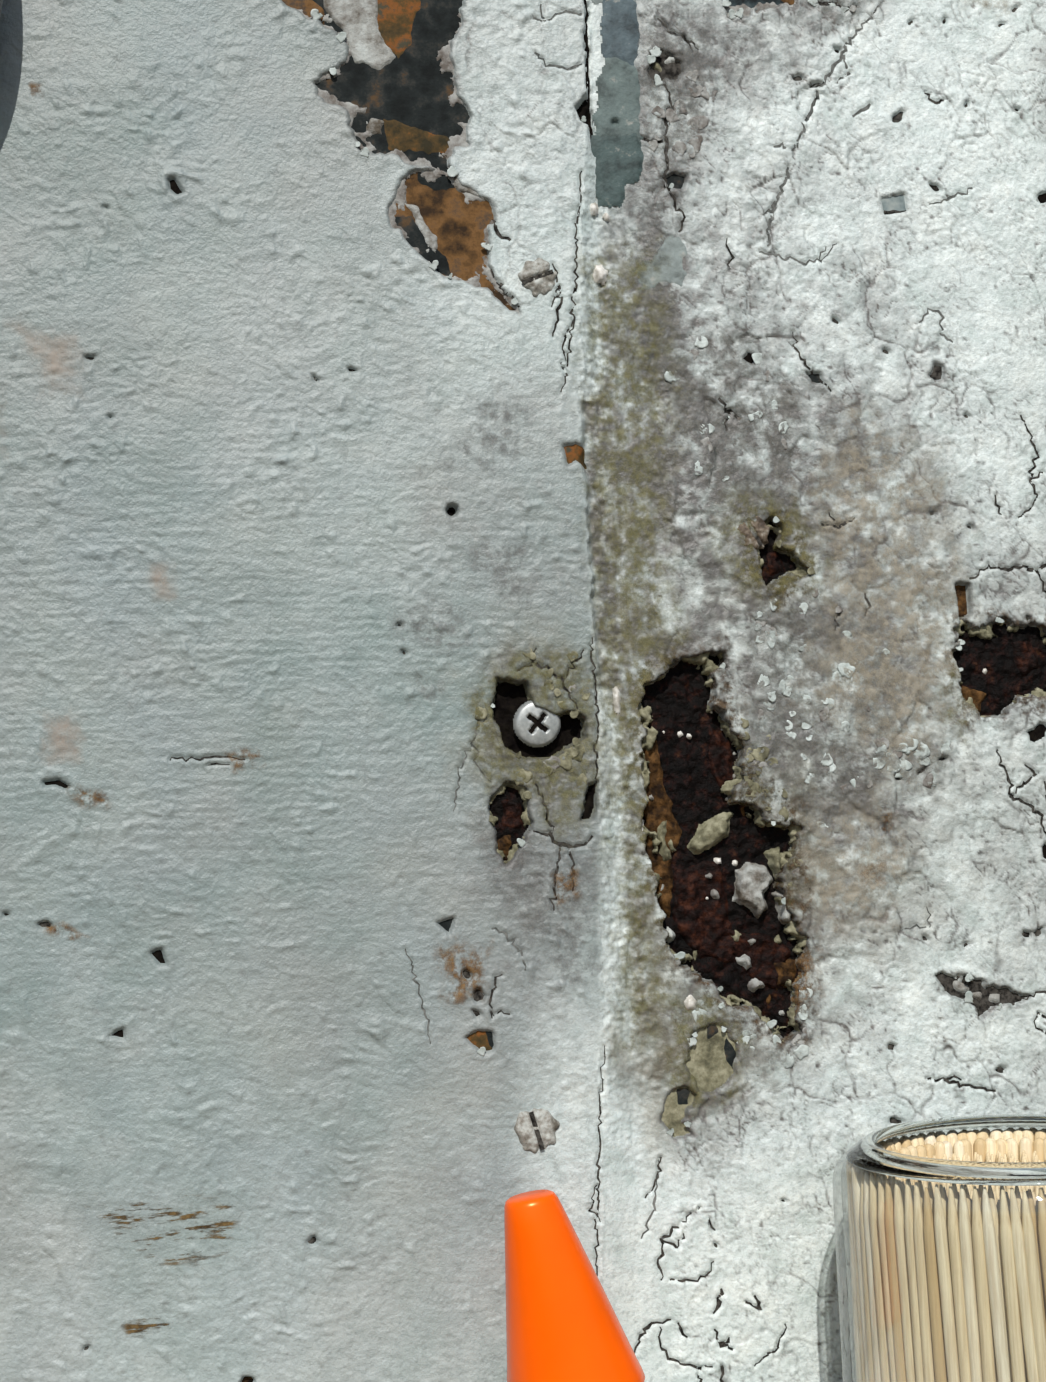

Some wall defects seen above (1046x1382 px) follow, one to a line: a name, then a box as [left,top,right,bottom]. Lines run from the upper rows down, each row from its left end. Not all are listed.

peeling [282,0,519,313]
crack [533,0,593,139]
peeling [576,0,718,208]
peeling [722,0,856,20]
crack [490,171,582,392]
crack [995,415,1043,518]
corrosion [945,615,1046,728]
peeling [513,737,595,819]
corrosion [636,648,815,1045]
crack [996,749,1046,834]
peeling [936,972,1028,1016]
crack [634,1157,787,1382]